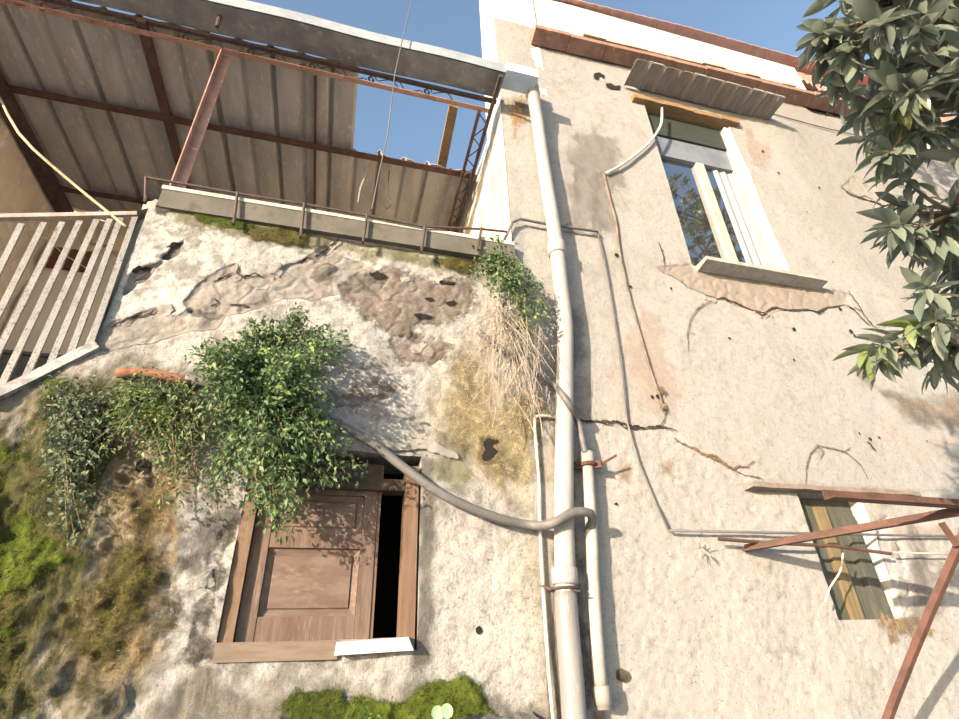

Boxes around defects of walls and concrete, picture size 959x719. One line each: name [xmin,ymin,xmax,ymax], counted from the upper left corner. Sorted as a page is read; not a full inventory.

flaking render [97,240,478,365]
flaking render [656,263,850,319]
crack [687,291,878,348]
crack [581,404,763,479]
damp [81,477,181,684]
damp [147,669,290,719]
damp [486,637,562,719]